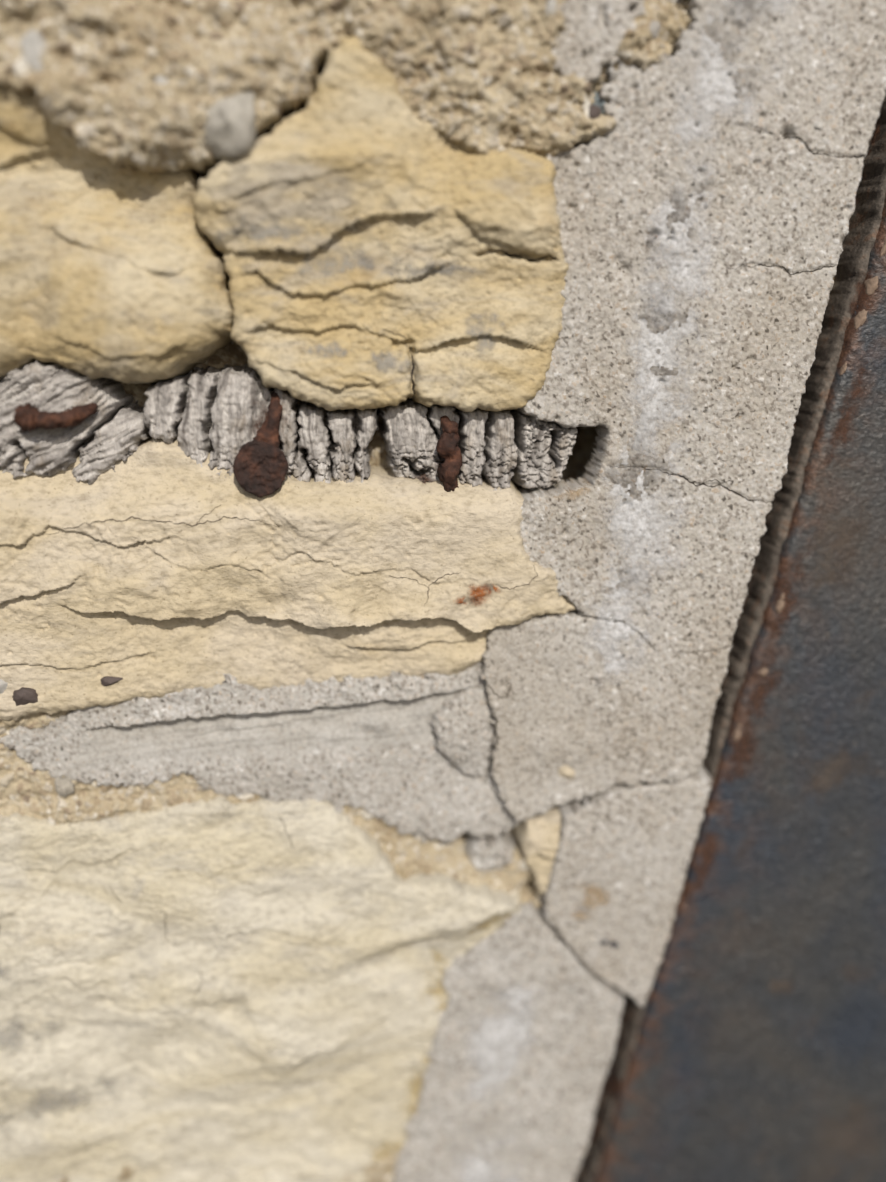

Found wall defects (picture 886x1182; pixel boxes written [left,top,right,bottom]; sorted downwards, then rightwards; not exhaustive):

crack [736,125,867,158]
corrosion [850,283,878,314]
crack [614,466,771,503]
crack [574,611,730,656]
crack [569,782,660,809]